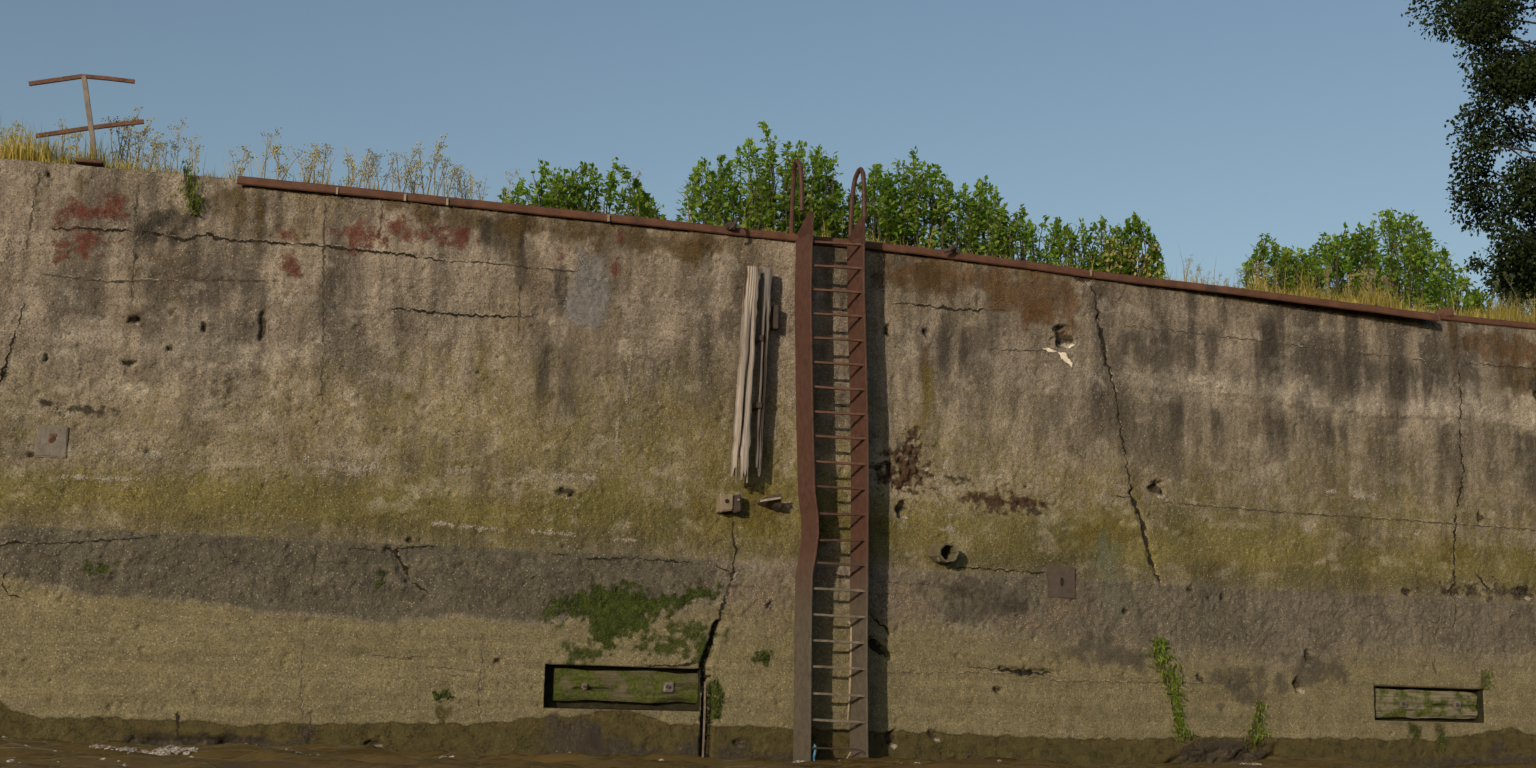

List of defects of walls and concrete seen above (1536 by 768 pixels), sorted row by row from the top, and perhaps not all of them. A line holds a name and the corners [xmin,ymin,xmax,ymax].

crack [0,173,574,408]
corrosion [386,199,725,268]
damp [302,454,376,476]
crack [309,545,435,597]
crack [554,521,738,758]
crack [1073,276,1536,675]